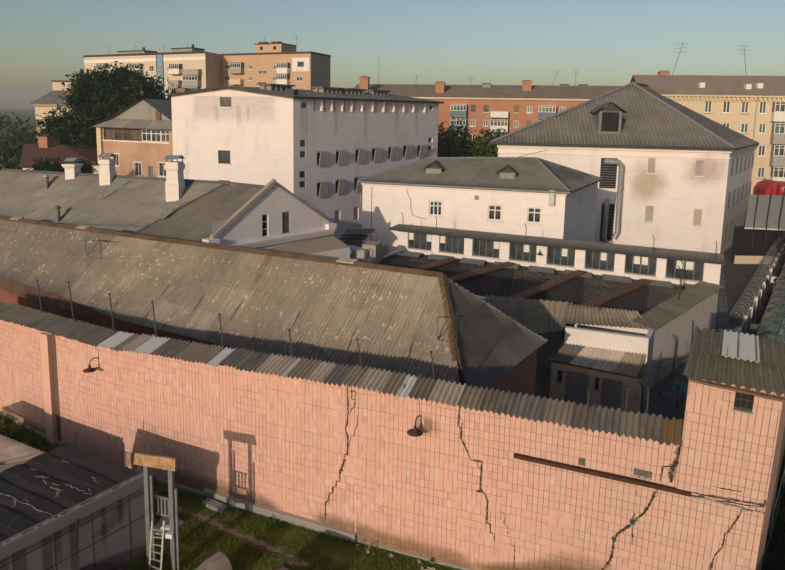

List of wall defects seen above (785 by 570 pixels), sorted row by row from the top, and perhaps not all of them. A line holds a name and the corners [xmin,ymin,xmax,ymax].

crack [324,384,358,521]
crack [457,408,518,570]
crack [599,444,681,570]
crack [691,486,767,570]